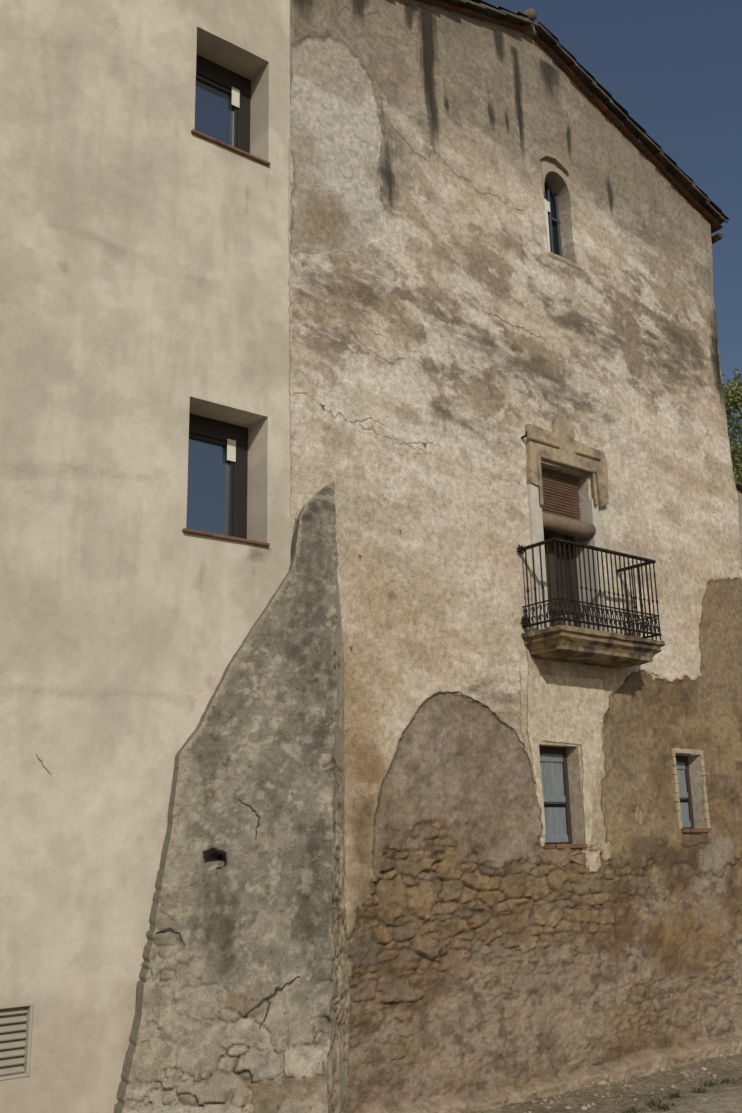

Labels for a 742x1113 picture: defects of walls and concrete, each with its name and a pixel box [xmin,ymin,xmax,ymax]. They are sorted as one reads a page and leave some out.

water stain [406,3,449,129]
water stain [488,30,522,134]
water stain [541,60,557,89]
water stain [382,149,395,201]
flaking render [345,577,742,1113]
crack [243,976,300,1030]